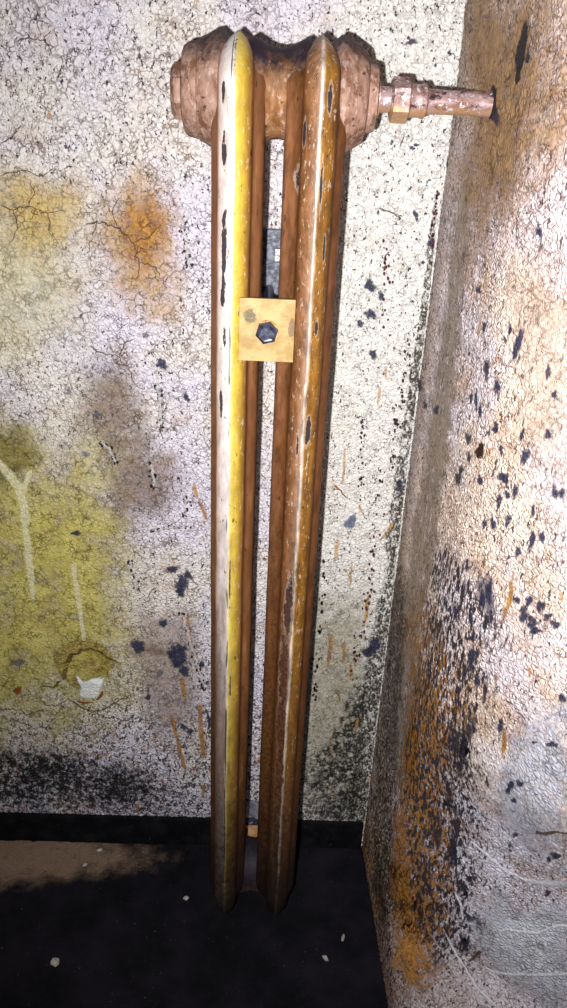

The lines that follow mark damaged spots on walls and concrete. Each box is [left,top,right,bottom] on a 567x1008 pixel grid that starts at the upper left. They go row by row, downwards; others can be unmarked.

crack [1,169,65,244]
crack [85,197,167,288]
water stain [389,0,566,985]
water stain [0,429,122,707]
flaking render [40,641,119,704]
water stain [0,751,185,814]
corrosion [389,686,449,989]